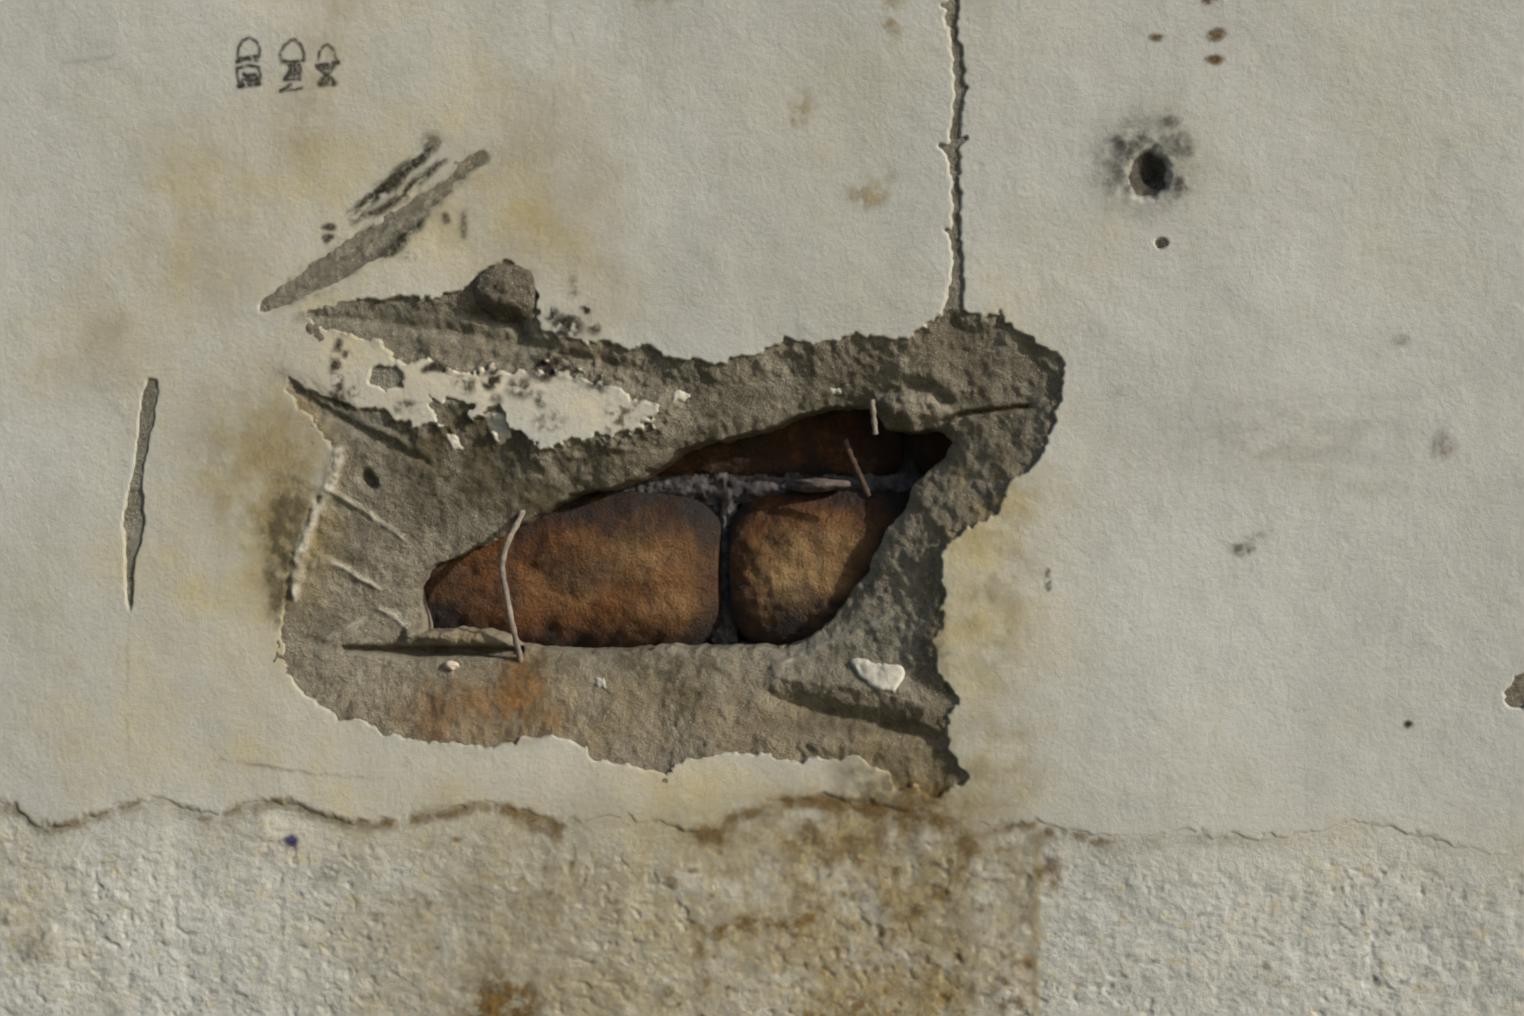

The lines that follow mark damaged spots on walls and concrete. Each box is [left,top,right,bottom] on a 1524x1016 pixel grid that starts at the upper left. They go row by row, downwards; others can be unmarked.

crack [939,0,968,315]
spalling [1129,152,1166,196]
flaking render [260,150,1064,798]
peeling [1504,673,1524,708]
crack [16,802,139,831]
water stain [712,790,968,1016]
corrosion [468,982,538,1016]